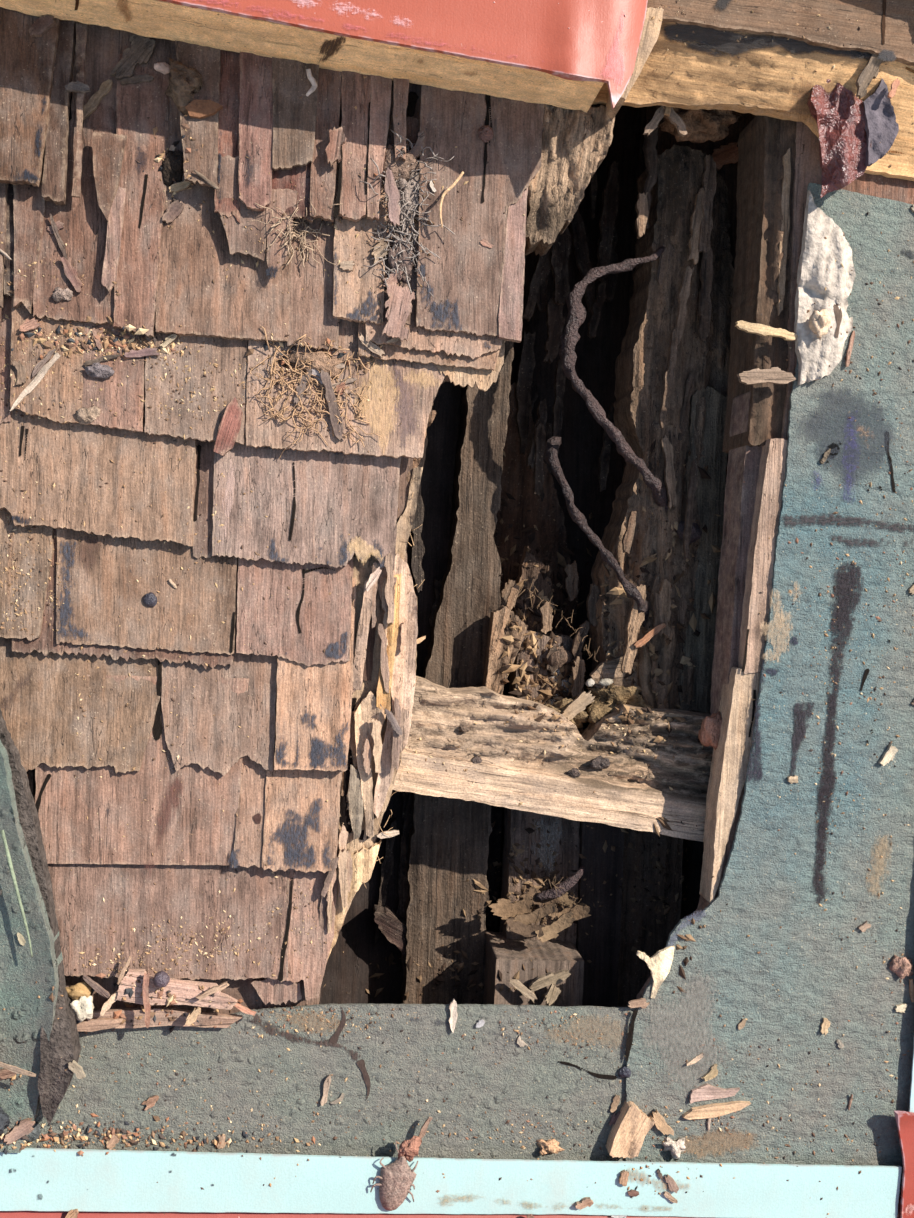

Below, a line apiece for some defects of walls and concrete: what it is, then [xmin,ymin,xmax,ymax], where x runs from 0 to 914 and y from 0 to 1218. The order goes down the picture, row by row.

crack [288,462,296,541]
crack [296,567,335,633]
crack [153,660,162,740]
peeling [562,656,635,720]
damp [816,694,840,893]
damp [267,798,331,869]
peeling [636,945,675,999]
crack [252,1007,370,1100]
crack [558,1010,638,1080]